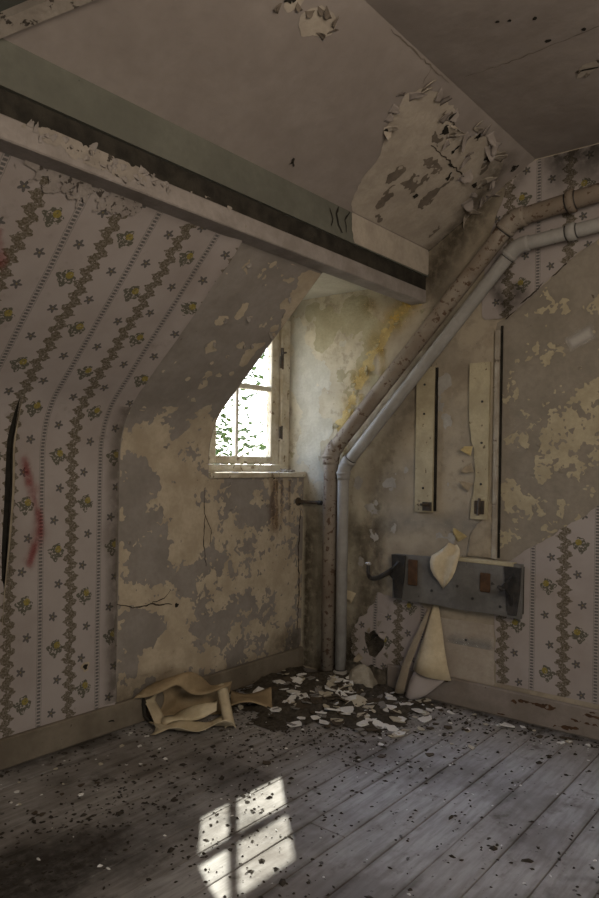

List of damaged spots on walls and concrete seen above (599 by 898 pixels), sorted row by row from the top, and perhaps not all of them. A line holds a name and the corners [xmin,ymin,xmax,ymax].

spalling [274,0,339,40]
peeling [21,119,171,194]
peeling [351,80,519,275]
peeling [524,287,571,317]
peeling [502,341,599,497]
peeling [117,260,424,702]
peeling [499,478,581,549]